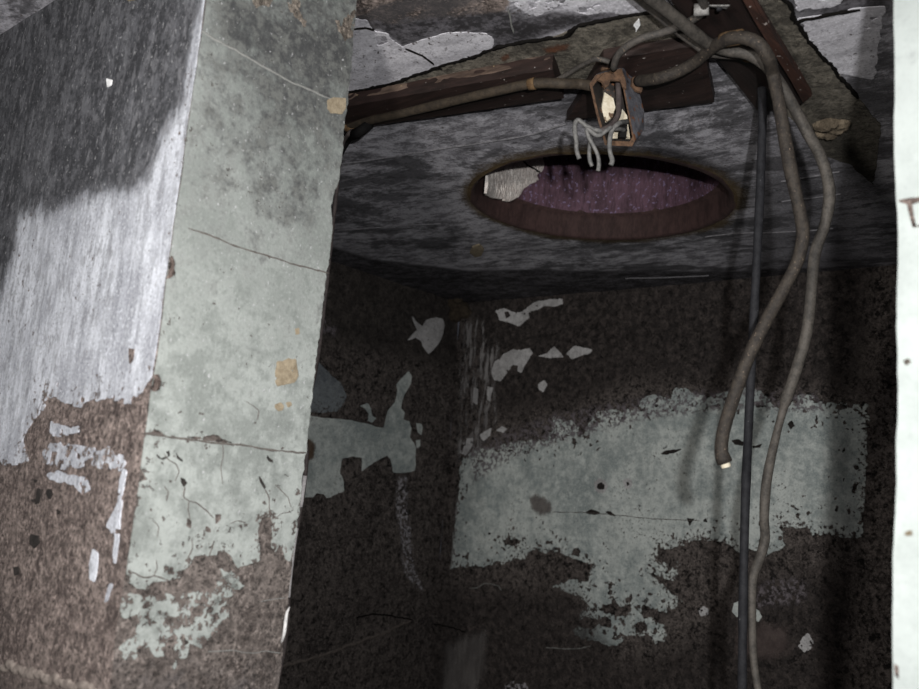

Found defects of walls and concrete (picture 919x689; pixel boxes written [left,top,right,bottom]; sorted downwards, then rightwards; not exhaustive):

crack [188,228,328,274]
peeling [0,0,679,669]
crack [142,432,307,524]
peeling [450,320,870,646]
crack [128,560,166,580]
crack [187,540,237,572]
peeling [798,633,814,652]